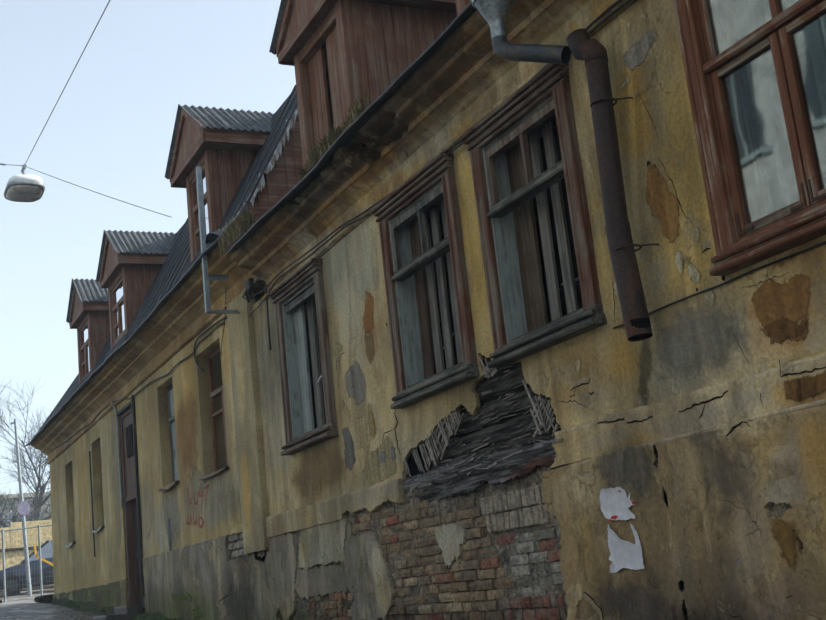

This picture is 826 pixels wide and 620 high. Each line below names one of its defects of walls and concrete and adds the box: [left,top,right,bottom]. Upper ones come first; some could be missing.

peeling [645,164,700,283]
peeling [751,274,811,346]
peeling [335,343,397,485]
crack [679,382,728,418]
crack [724,414,750,437]
crack [779,352,826,377]
spalling [768,502,793,518]
spalling [352,484,568,620]